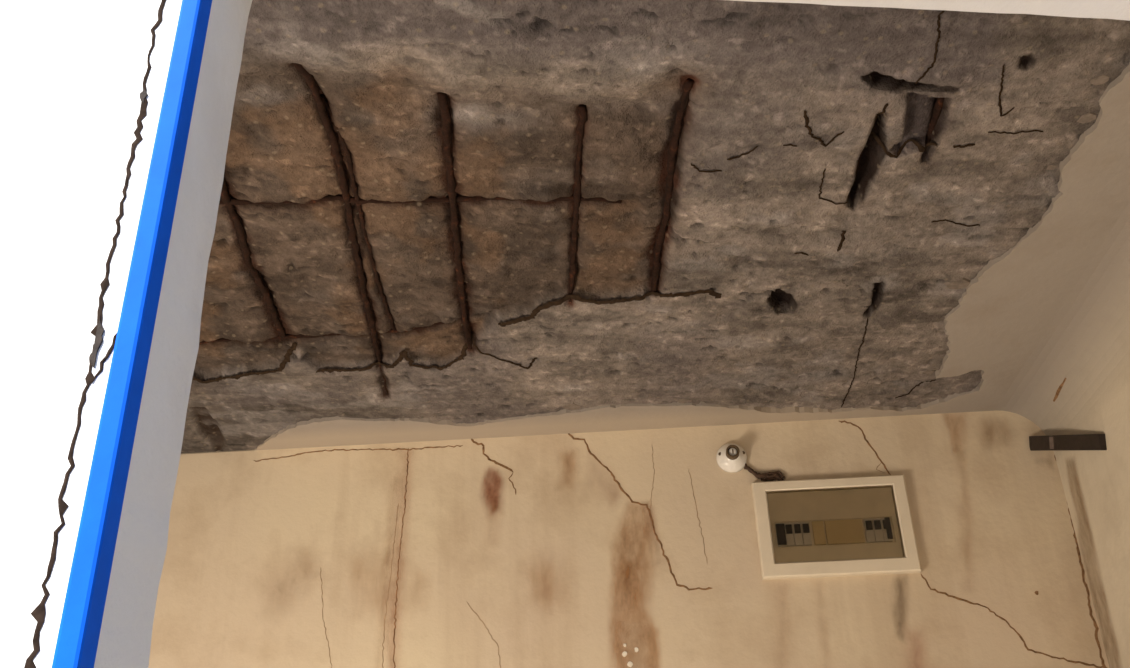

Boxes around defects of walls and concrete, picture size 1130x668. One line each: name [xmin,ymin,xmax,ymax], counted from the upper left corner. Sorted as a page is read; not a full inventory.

crack [915,10,945,83]
peeling [181,0,1130,453]
crack [691,64,1043,252]
crack [839,318,891,475]
crack [254,439,516,668]
corrosion [485,473,500,510]
leakage [616,644,639,667]
crack [568,433,712,591]
crack [921,504,1107,668]